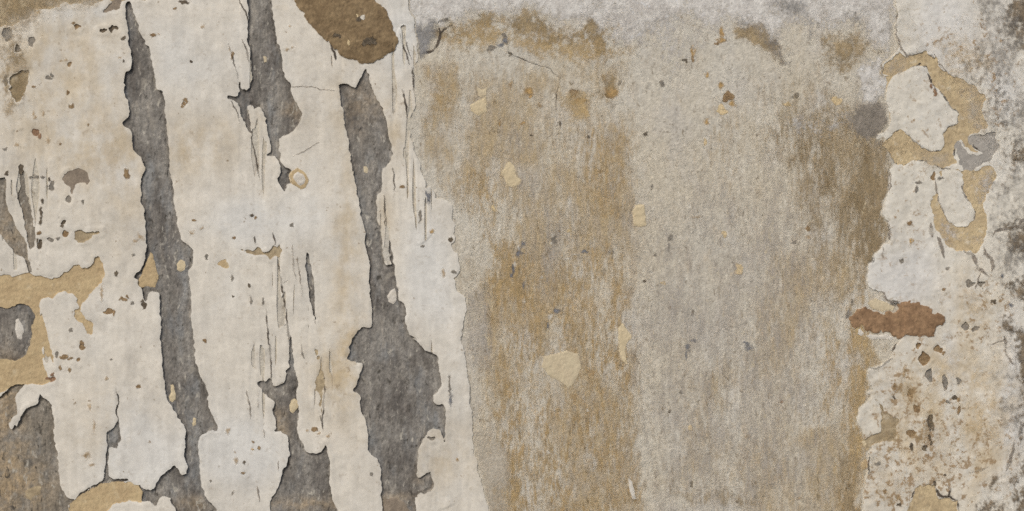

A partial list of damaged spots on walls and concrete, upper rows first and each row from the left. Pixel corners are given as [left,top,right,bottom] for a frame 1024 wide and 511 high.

peeling [227,0,309,192]
damp [410,0,895,265]
peeling [880,51,1000,254]
peeling [0,1,234,511]
peeling [257,337,338,511]
peeling [339,69,452,511]
spalling [849,298,962,414]